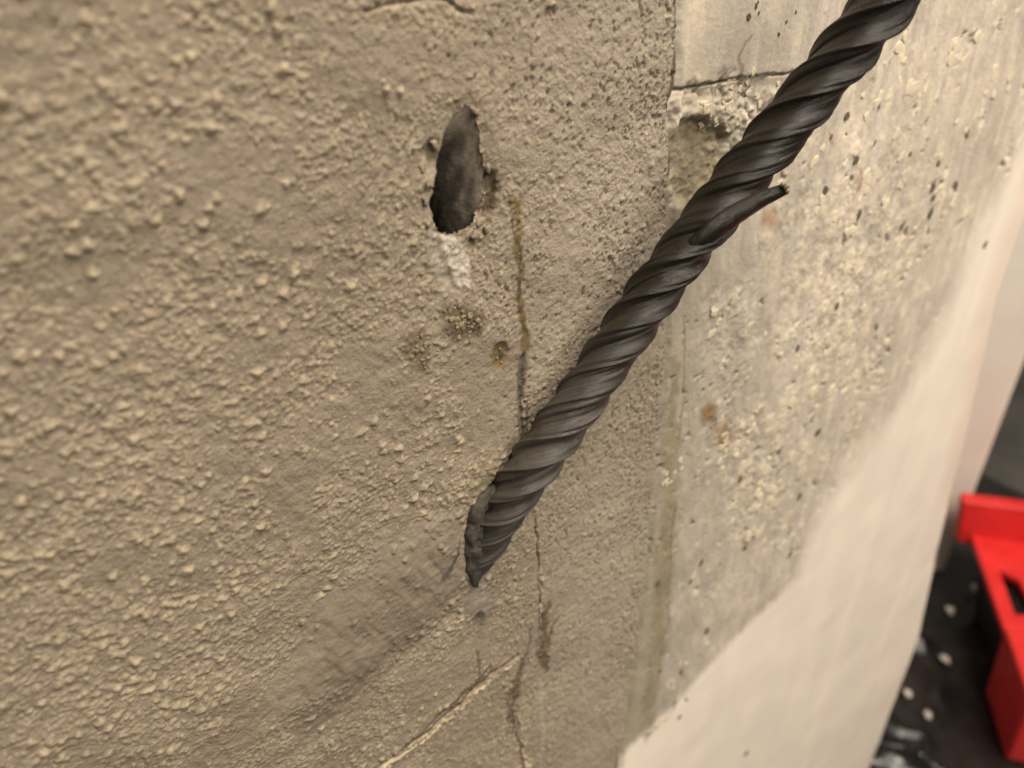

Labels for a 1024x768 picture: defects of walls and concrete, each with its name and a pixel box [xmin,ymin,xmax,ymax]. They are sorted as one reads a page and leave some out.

crack [670,2,792,95]
peeling [418,140,439,228]
spalling [470,163,497,239]
spalling [669,67,762,220]
crack [534,517,543,623]
crack [375,653,544,768]